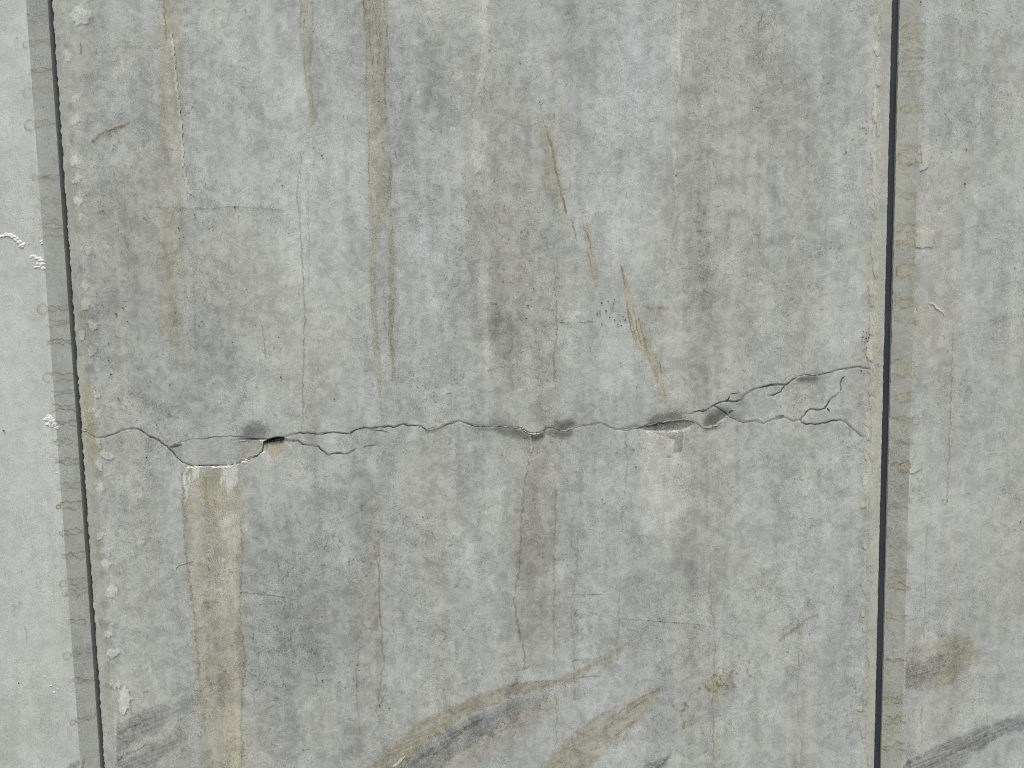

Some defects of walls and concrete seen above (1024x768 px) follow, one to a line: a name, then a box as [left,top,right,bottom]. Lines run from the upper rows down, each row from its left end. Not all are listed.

crack [89,365,878,466]
efflorescence [183,459,249,496]
leakage [218,514,241,768]